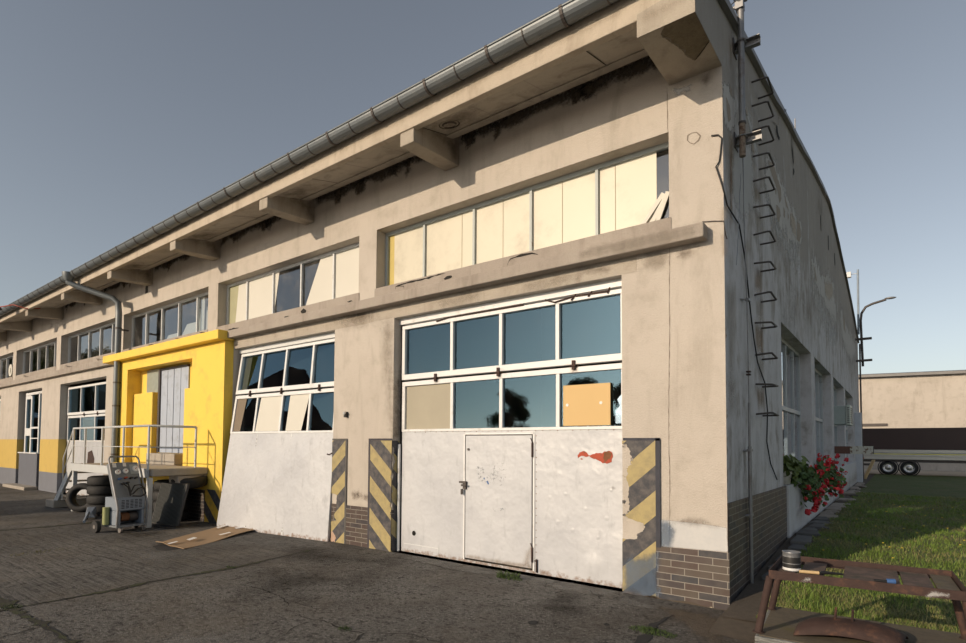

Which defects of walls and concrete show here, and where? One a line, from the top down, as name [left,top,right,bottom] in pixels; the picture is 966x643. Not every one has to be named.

water stain [452,56,657,152]
water stain [316,156,423,203]
peeling [722,82,802,264]
water stain [202,216,281,245]